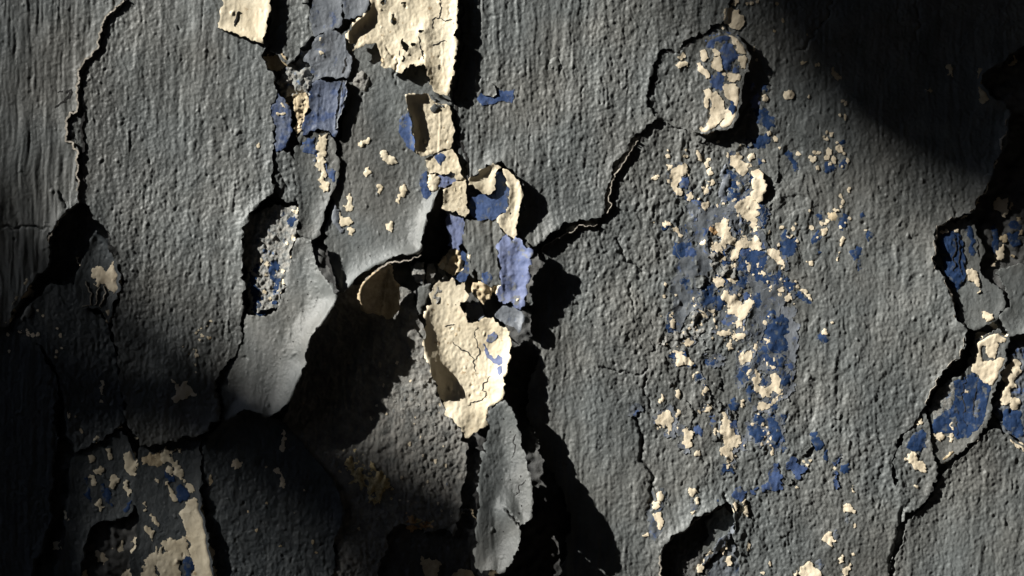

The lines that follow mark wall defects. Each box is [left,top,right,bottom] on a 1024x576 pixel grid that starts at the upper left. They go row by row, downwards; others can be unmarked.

crack [55,2,125,205]
peeling [263,53,348,192]
peeling [345,0,459,112]
crack [535,26,717,272]
peeling [64,412,217,576]
crack [167,381,241,503]
spalling [243,204,299,316]
spalling [279,149,534,576]
peeling [627,0,874,576]
crack [928,206,993,403]
peeling [904,311,1024,473]
peeling [938,197,1023,293]